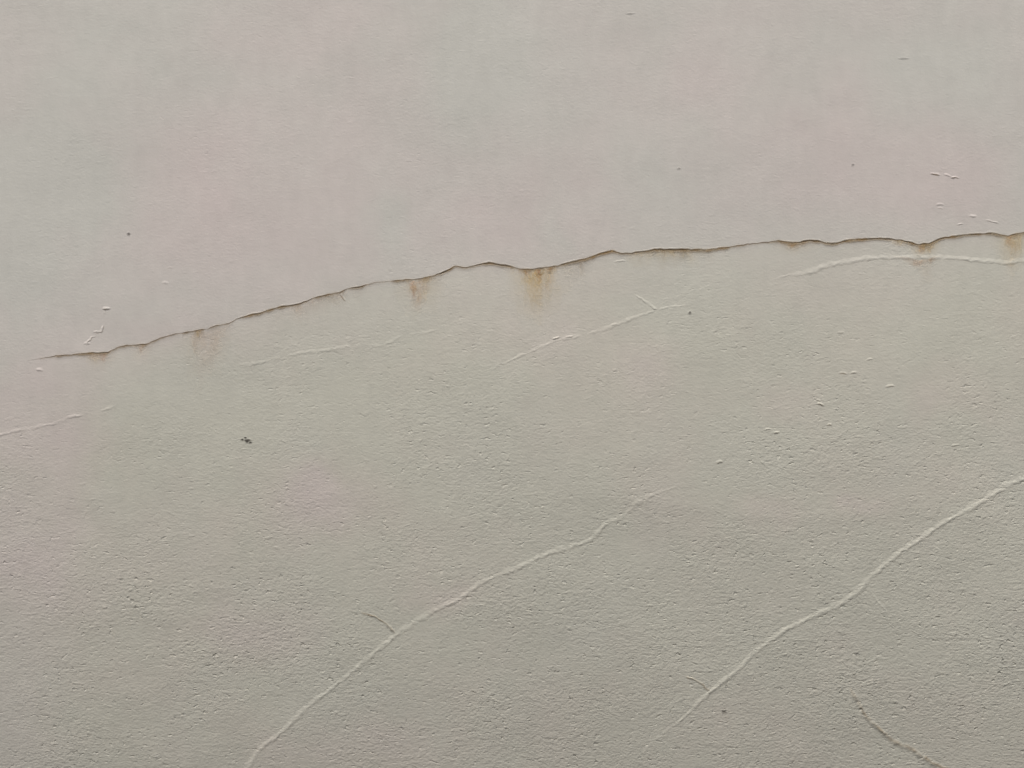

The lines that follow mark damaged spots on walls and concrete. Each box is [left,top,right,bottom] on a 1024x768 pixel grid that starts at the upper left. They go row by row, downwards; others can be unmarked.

crack [31,231,1024,360]
crack [460,294,689,383]
crack [243,480,690,768]
crack [625,475,1024,768]